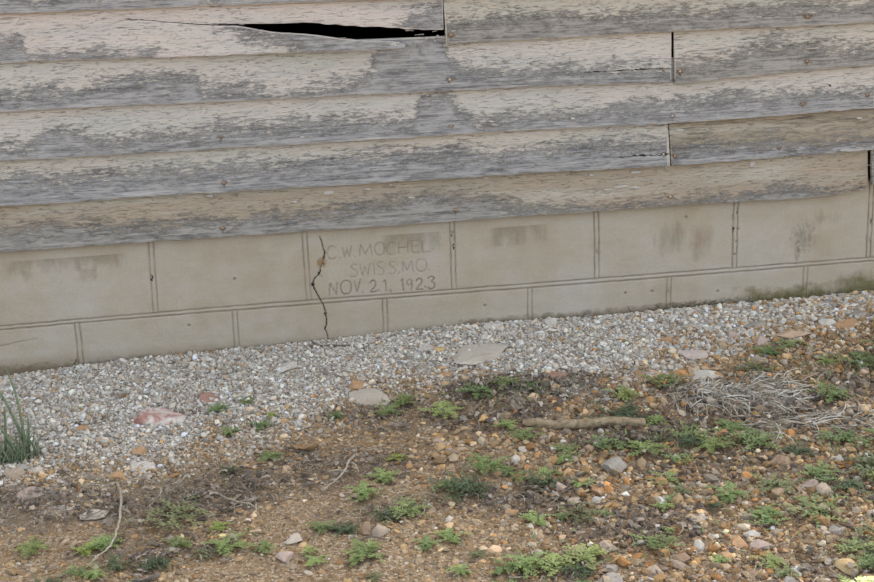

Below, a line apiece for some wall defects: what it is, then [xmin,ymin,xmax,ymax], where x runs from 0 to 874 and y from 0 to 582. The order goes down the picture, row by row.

crack [127,18,244,27]
crack [311,239,328,337]